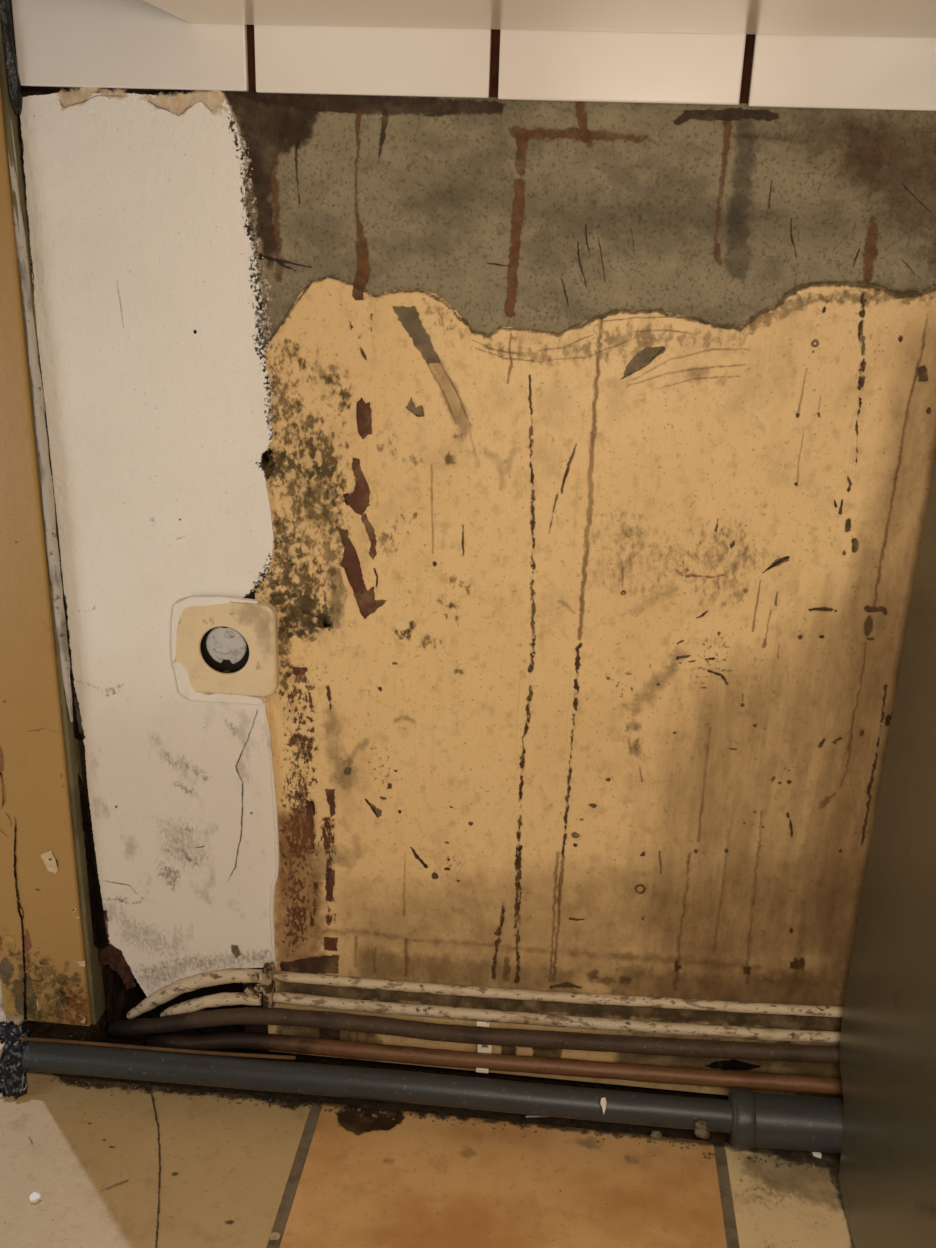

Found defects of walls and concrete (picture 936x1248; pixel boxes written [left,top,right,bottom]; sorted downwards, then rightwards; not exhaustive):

water stain [225,92,318,280]
rust [225,91,504,290]
spalling [58,87,936,441]
rust [504,102,648,317]
rust [674,108,779,184]
water stain [260,339,352,696]
peeling [336,458,387,619]
peeling [762,556,790,573]
peeling [842,519,858,555]
crack [14,817,27,1020]
crack [230,710,258,877]
rust [279,665,339,974]